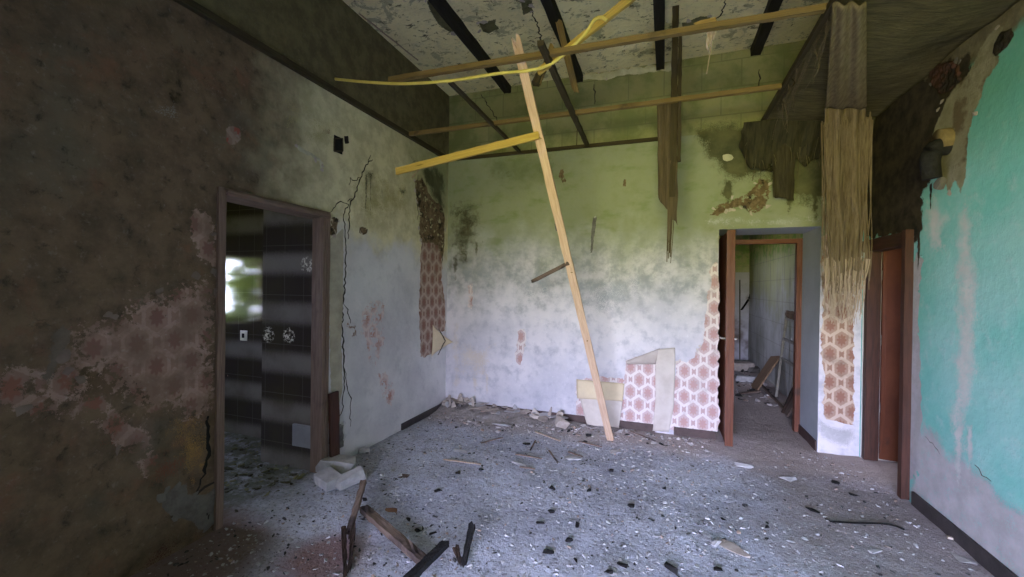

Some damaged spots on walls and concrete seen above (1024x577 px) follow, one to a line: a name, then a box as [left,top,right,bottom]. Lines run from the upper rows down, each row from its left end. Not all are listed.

spalling [583,62,671,81]
flaking render [932,25,1014,196]
spalling [414,179,446,258]
water stain [412,156,499,285]
spalling [710,178,773,216]
crack [331,155,372,426]
peeling [431,326,452,357]
peeling [626,348,681,432]
crack [196,416,214,519]